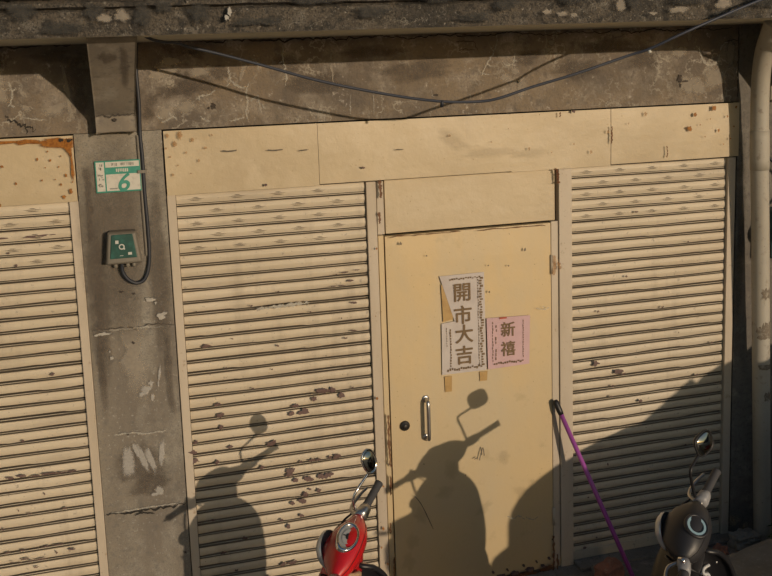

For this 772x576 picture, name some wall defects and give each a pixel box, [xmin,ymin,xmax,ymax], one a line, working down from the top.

crack [179,27,739,97]
crack [5,116,36,134]
corrosion [0,137,75,199]
peeling [140,368,161,401]
peeling [123,442,165,474]
crack [107,501,187,516]